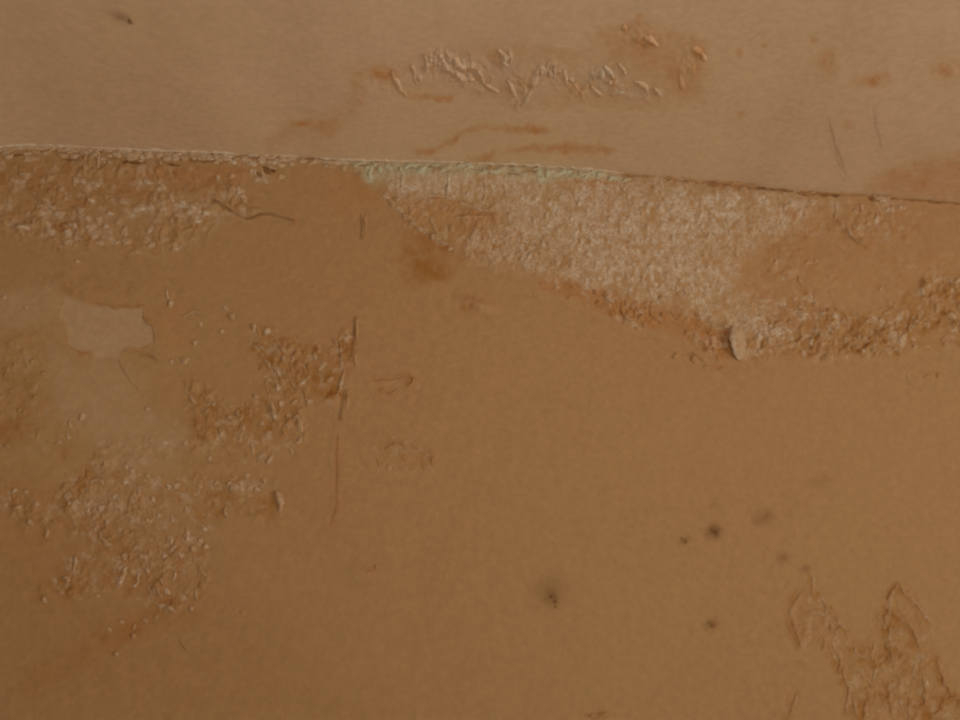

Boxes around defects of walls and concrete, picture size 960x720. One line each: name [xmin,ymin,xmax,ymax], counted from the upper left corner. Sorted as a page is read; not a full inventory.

spalling [229,156,298,192]
peeling [715,268,960,379]